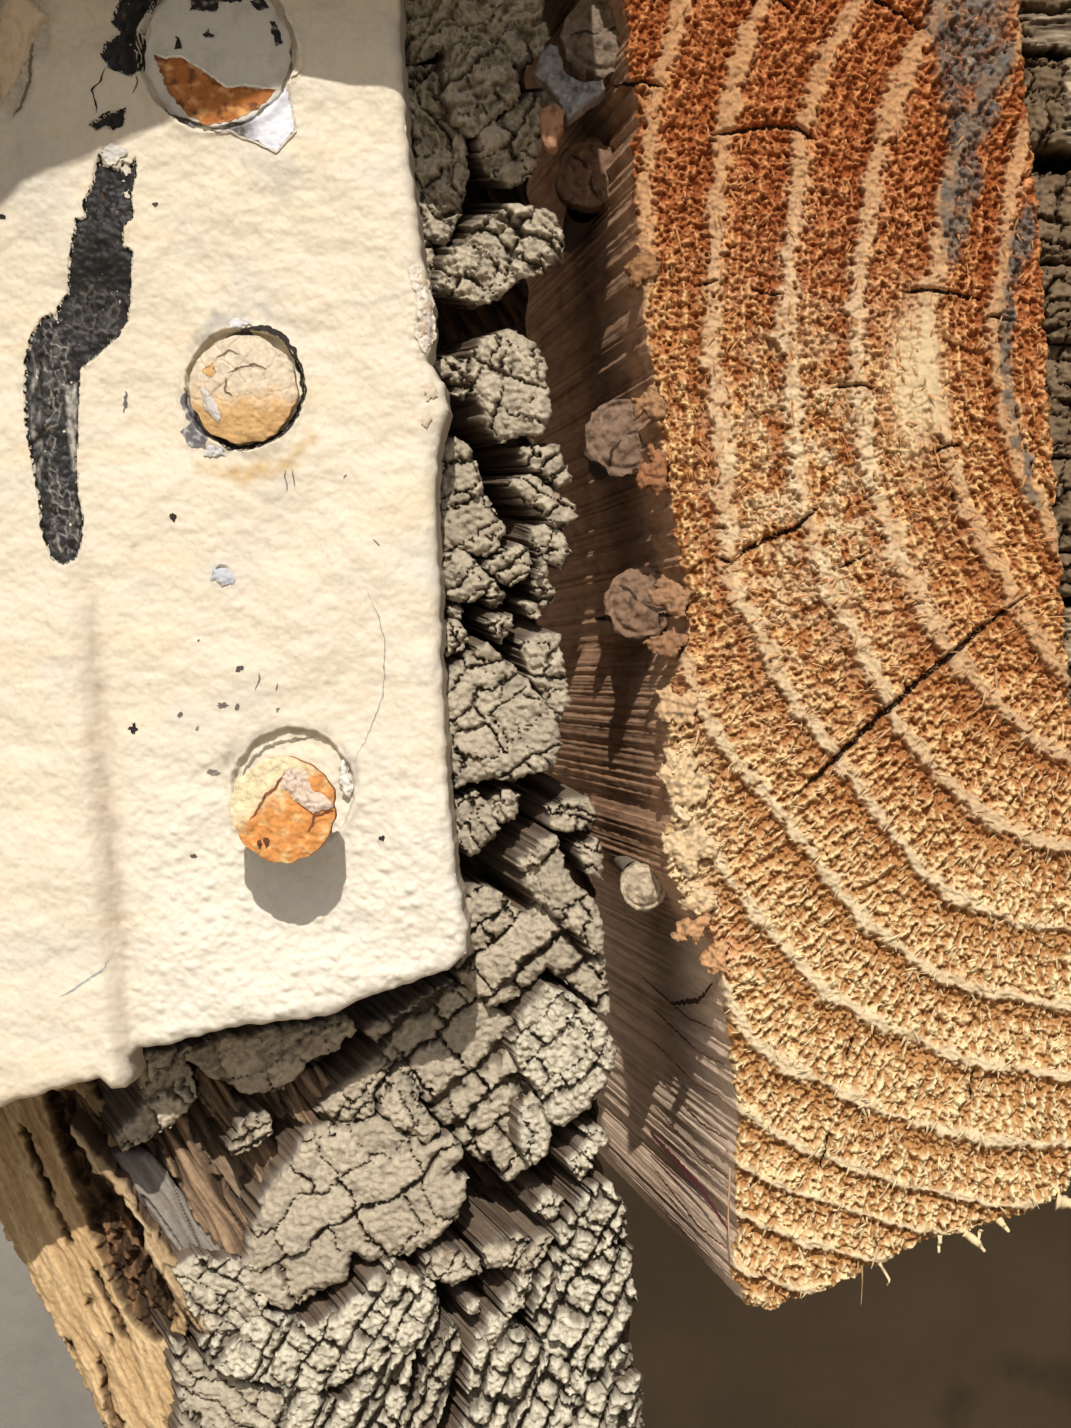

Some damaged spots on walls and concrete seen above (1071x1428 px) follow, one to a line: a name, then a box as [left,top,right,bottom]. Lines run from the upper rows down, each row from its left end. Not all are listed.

rust [154,54,275,125]
peeling [165,0,303,153]
peeling [23,0,166,565]
rust [202,362,216,378]
peeling [198,385,221,422]